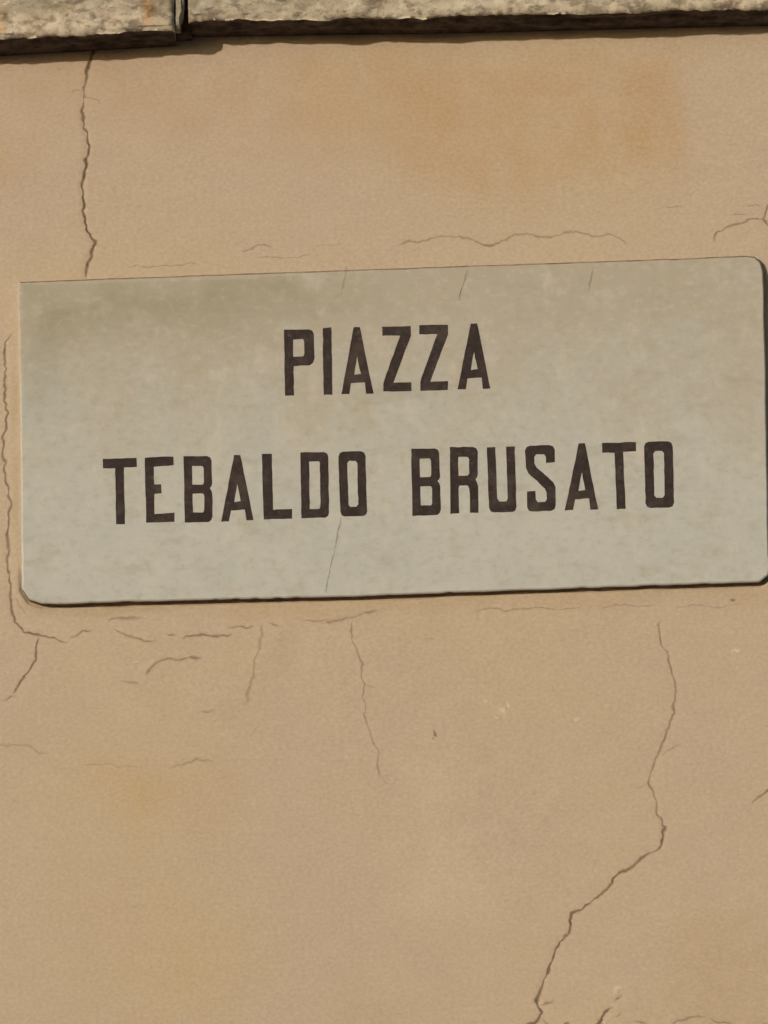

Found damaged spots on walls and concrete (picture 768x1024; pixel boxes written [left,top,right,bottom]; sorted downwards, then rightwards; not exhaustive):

crack [80,51,96,276]
crack [2,337,55,691]
crack [528,818,666,1024]